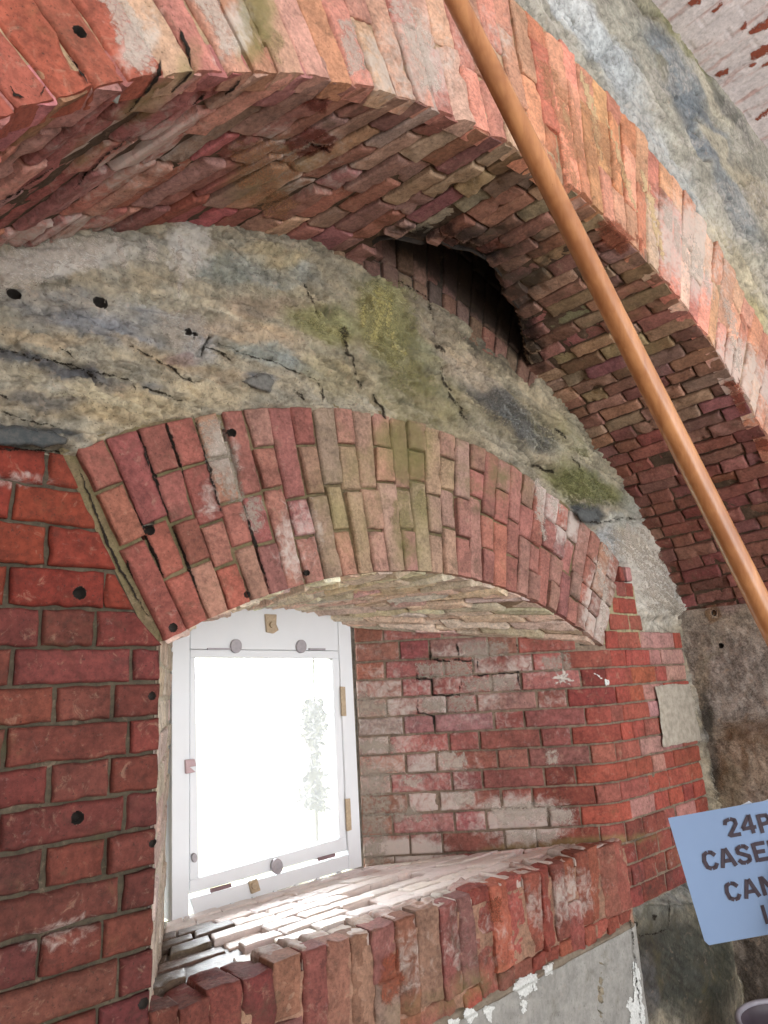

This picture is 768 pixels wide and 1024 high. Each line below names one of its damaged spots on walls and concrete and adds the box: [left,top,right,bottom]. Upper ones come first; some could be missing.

peeling [740,18,768,34]
peeling [749,45,768,67]
crack [0,345,194,401]
crack [340,326,386,419]
peeling [448,1006,495,1024]
peeling [513,961,554,1014]
peeling [626,962,646,1024]